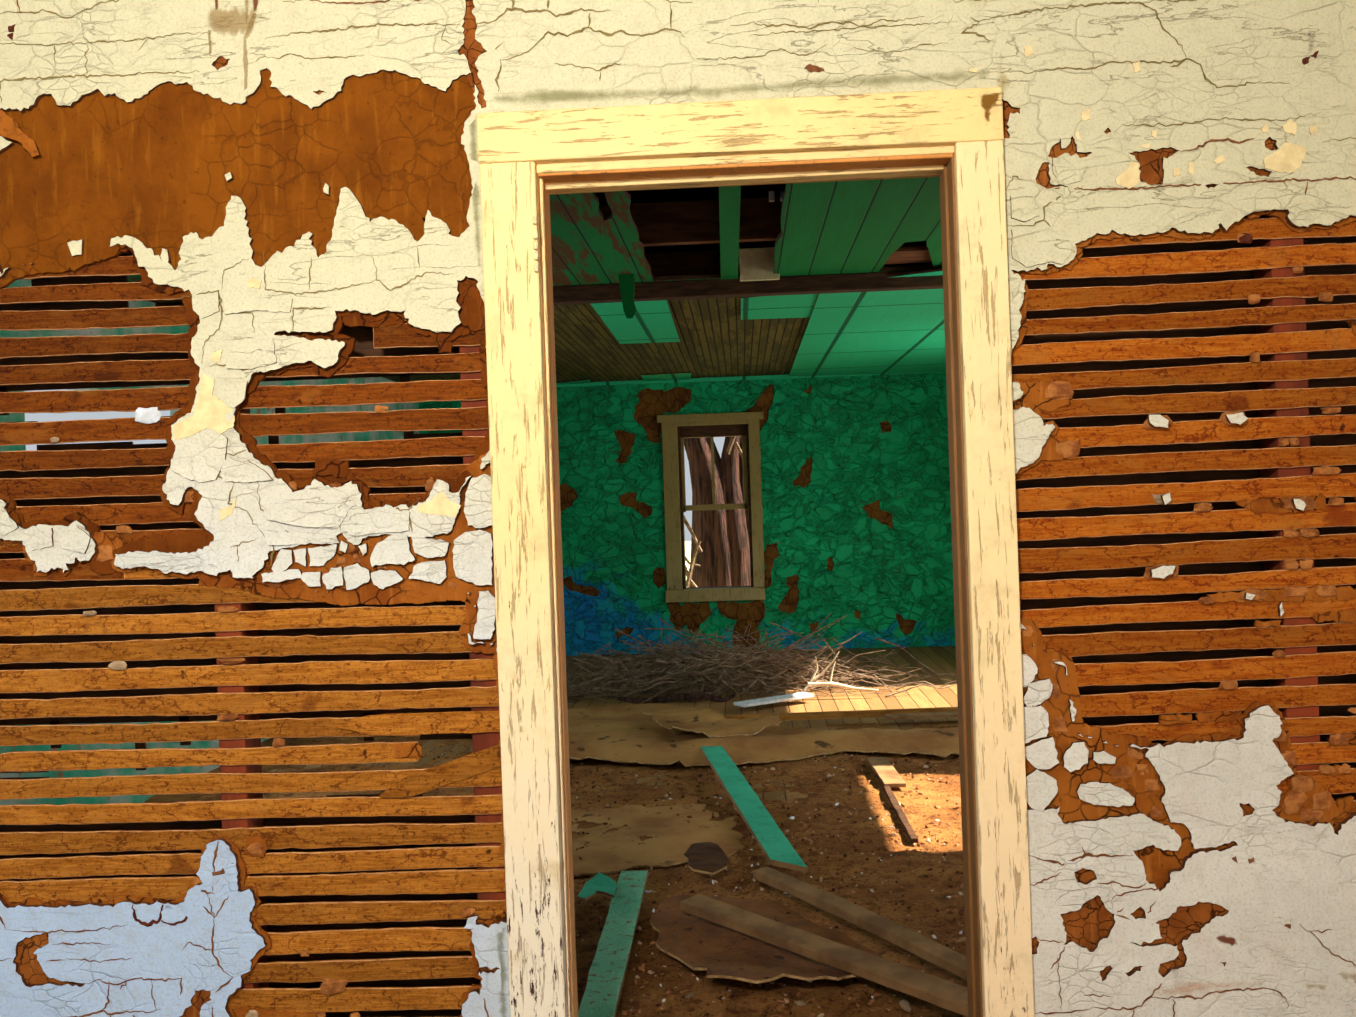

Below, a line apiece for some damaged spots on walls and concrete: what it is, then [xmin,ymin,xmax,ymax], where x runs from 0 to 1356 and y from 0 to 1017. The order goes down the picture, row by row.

crack [0,0,214,102]
crack [264,0,1356,152]
spalling [1115,129,1194,189]
crack [1007,175,1356,227]
spalling [0,1,507,1017]
peeling [667,543,799,651]
spalling [1011,210,1356,889]
crack [0,843,233,1017]
spalling [1060,895,1114,950]
crack [1029,847,1161,920]
crack [1035,938,1289,1017]
spalling [1131,901,1227,976]